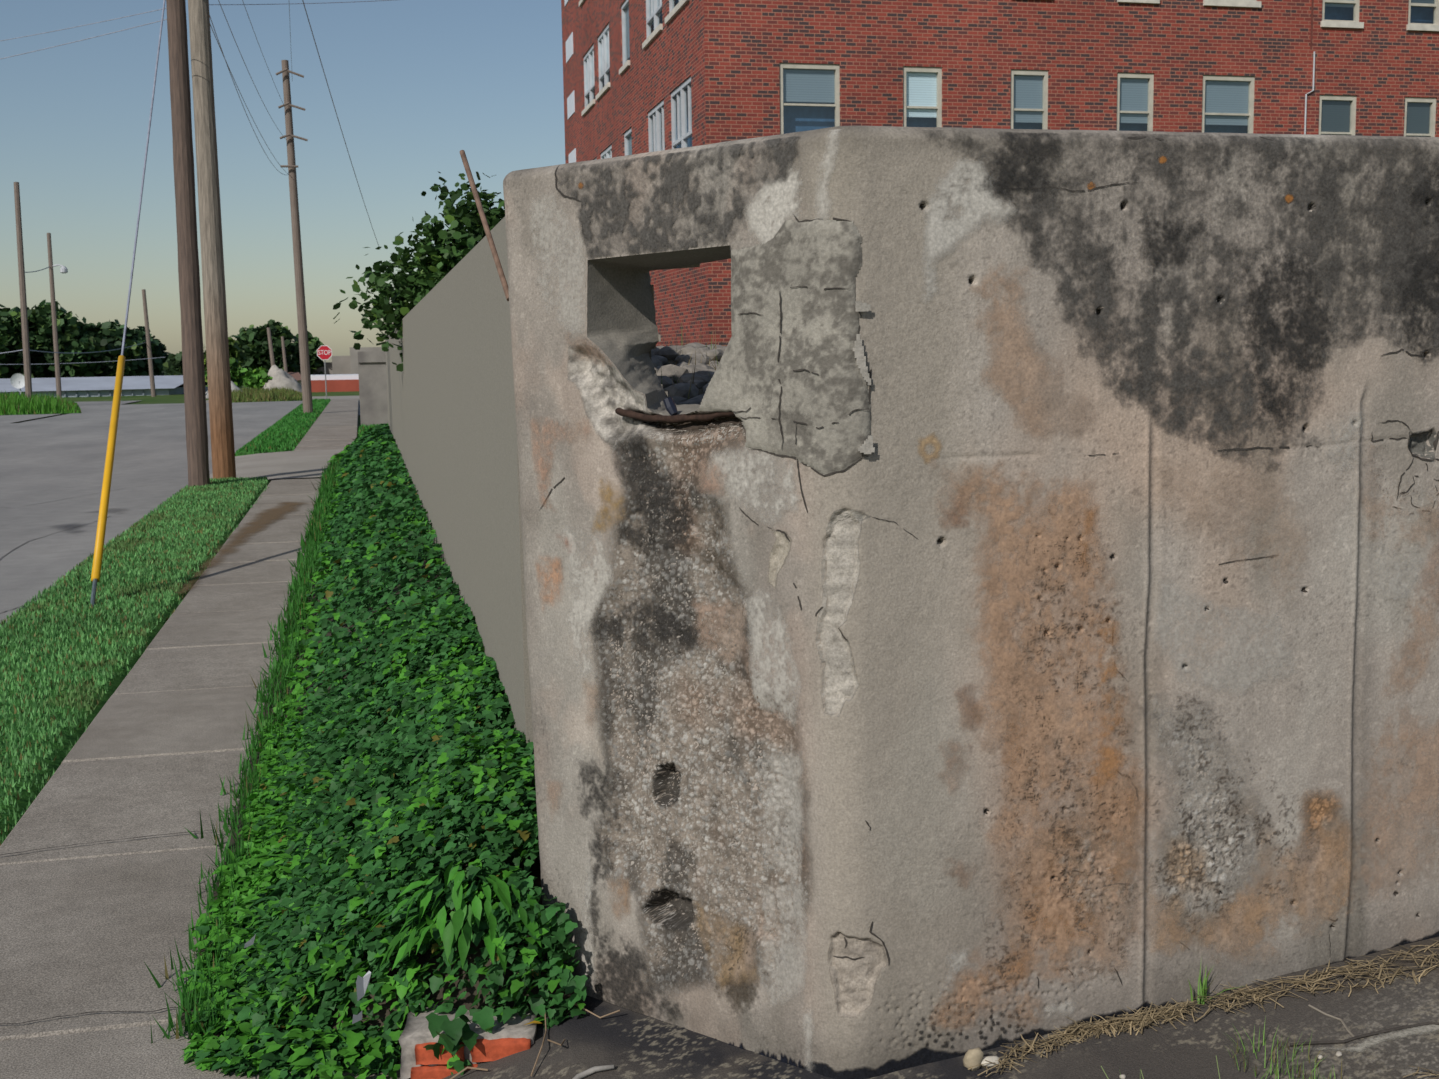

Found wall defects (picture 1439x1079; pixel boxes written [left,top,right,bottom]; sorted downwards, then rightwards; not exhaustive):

damp [533,136,801,329]
damp [817,129,838,218]
damp [924,132,1439,457]
crack [1382,348,1421,356]
crack [1371,420,1439,514]
spalling [568,340,809,988]
spalling [816,509,870,716]
rust [939,470,1136,1023]
spalling [828,932,888,1017]